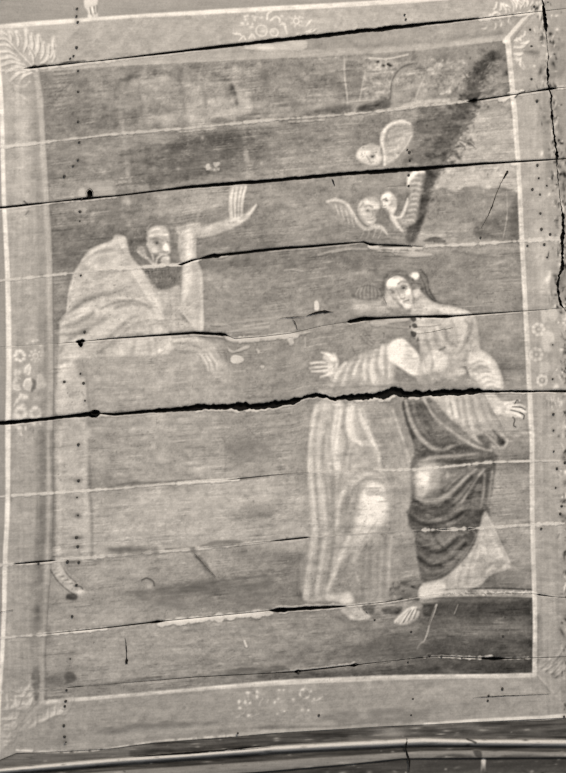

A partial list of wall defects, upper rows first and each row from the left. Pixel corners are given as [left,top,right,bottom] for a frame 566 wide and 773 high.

crack [0,0,566,349]
crack [0,387,566,427]
crack [0,594,552,692]
crack [534,591,566,599]